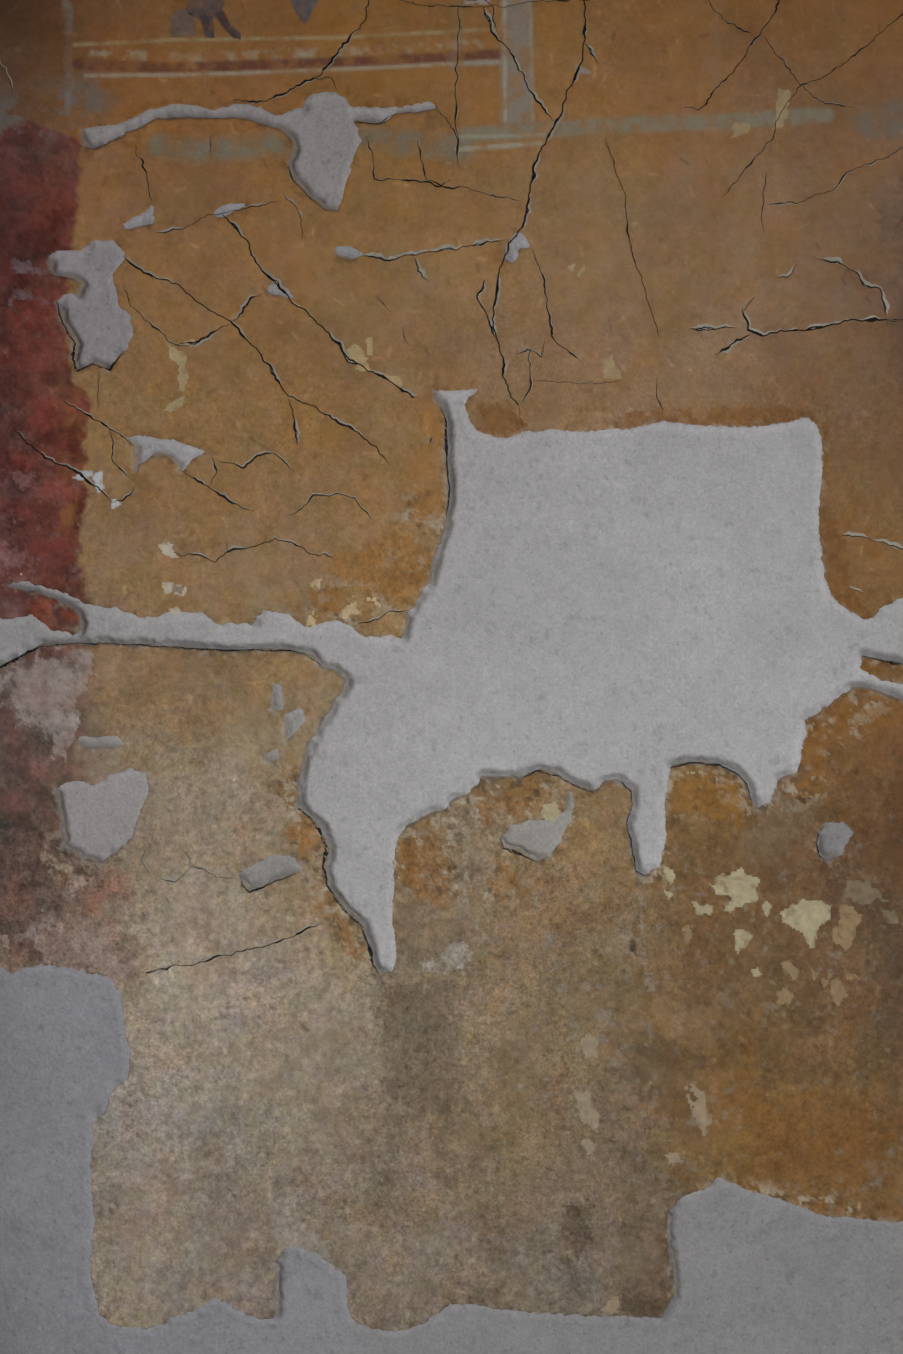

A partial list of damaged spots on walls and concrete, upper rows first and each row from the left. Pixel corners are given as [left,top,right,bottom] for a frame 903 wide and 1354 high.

crack [236,0,369,104]
crack [684,0,903,228]
crack [364,0,620,430]
crack [123,146,418,511]
crack [692,257,903,354]
crack [15,380,134,502]
peeling [158,542,178,558]
peeling [162,582,186,615]
peeling [682,867,899,955]
peeling [776,961,860,1006]
peeling [573,1089,601,1156]
peeling [684,1084,714,1136]